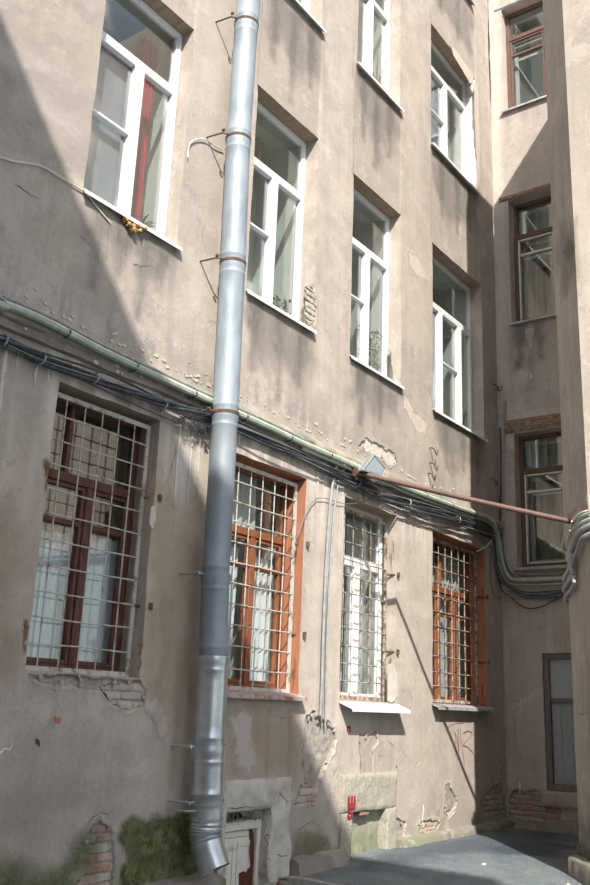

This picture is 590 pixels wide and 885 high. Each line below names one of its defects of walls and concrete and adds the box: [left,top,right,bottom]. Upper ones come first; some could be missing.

flaking render [239,393,416,480]
flaking render [29,672,151,712]
flaking render [294,711,337,809]
flaking render [75,816,116,885]
crack [227,791,289,866]
flaking render [418,782,457,833]
flaking render [508,787,562,824]